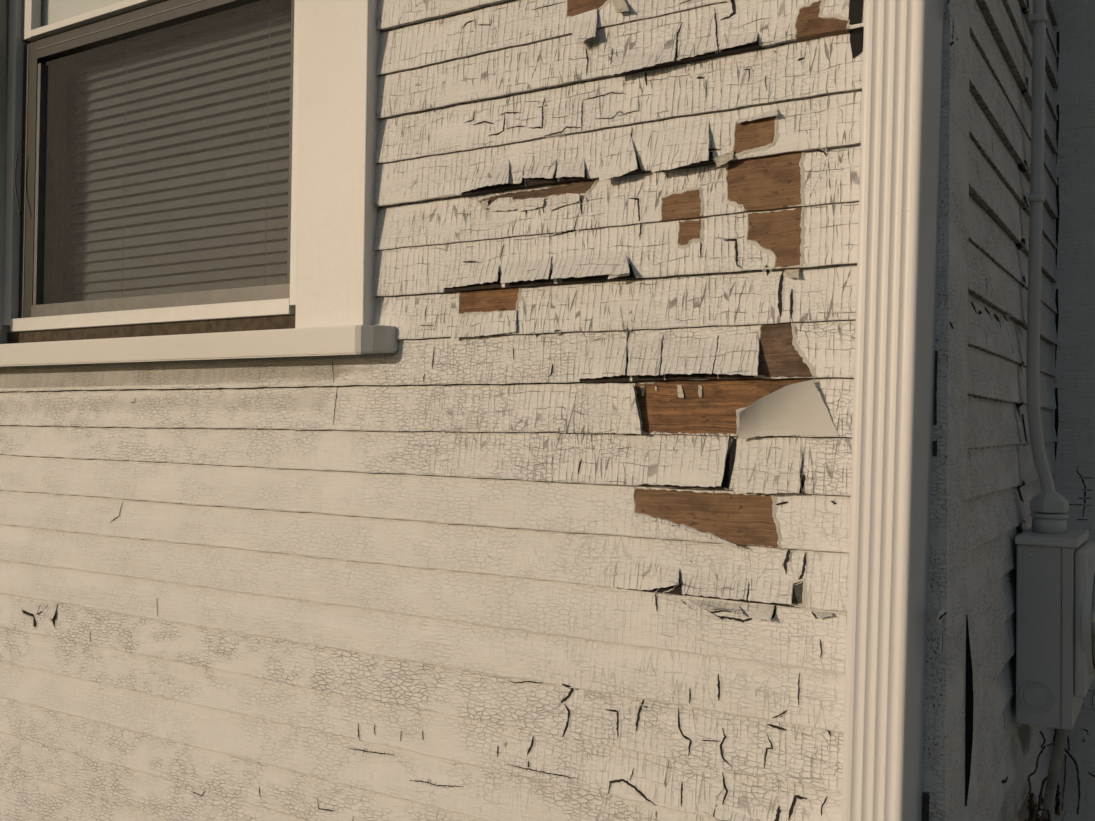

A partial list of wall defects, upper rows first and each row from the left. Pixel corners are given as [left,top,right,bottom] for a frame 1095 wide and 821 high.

peeling [564,0,629,44]
peeling [791,0,851,42]
crack [464,47,650,146]
peeling [460,108,807,279]
peeling [442,251,639,339]
crack [698,236,797,319]
peeling [577,322,839,549]
crack [653,561,779,625]
peeling [610,561,834,622]
crack [496,679,578,780]
crack [605,673,733,821]
crack [771,793,829,821]